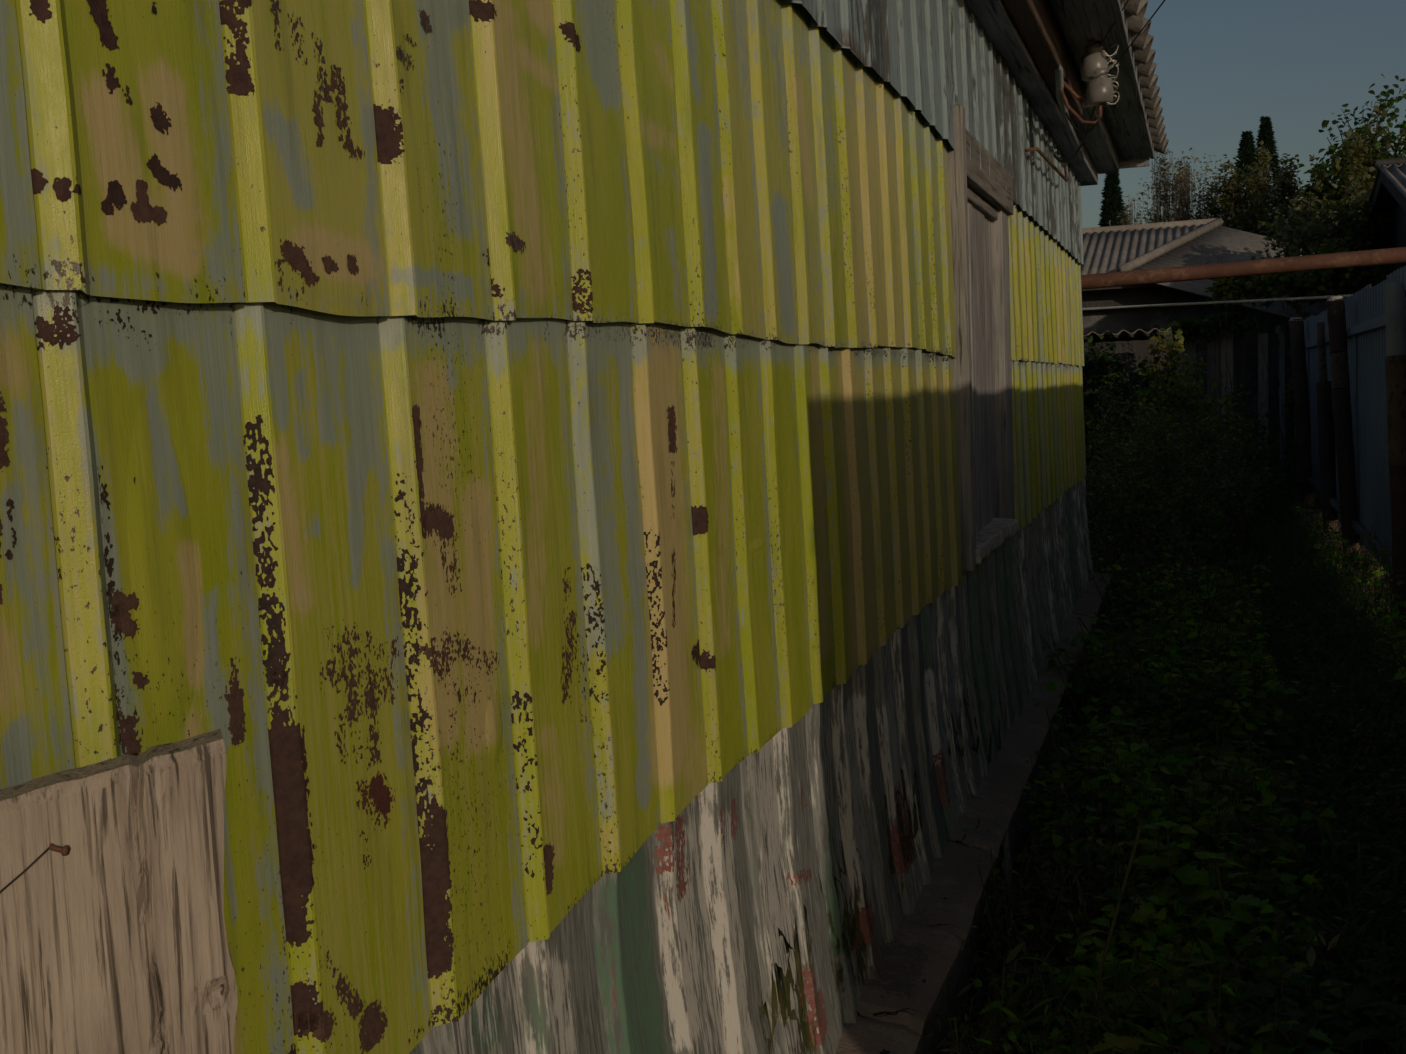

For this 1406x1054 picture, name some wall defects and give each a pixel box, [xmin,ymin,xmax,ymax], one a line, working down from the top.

rust [29,0,52,23]
rust [87,0,133,105]
rust [150,102,172,135]
rust [219,0,255,96]
rust [270,0,433,164]
rust [31,168,81,202]
rust [101,153,182,226]
rust [275,239,359,287]
rust [98,465,150,756]
rust [217,658,247,746]
rust [243,415,388,1054]
rust [320,404,500,979]